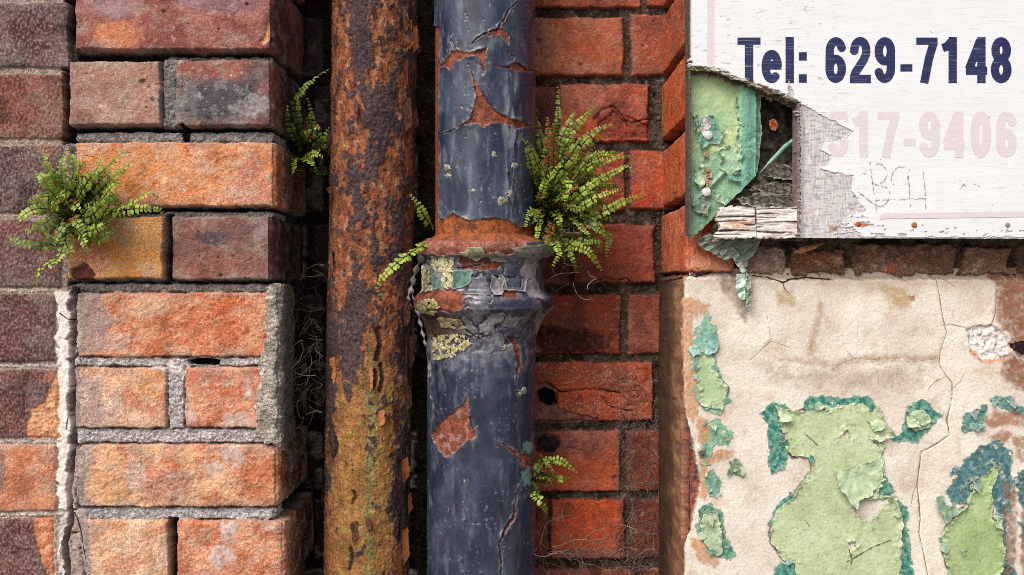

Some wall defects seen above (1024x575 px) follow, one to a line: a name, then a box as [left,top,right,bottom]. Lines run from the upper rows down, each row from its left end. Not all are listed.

peeling [440,28,535,129]
peeling [697,233,761,312]
crack [752,275,831,293]
spalling [966,325,1024,363]
damp [987,270,1024,388]
peeling [432,397,476,457]
crack [546,382,632,419]
peeling [682,311,745,560]
peeling [759,394,942,575]
crack [911,275,999,575]
peeling [936,438,1024,575]
peeling [961,395,1024,433]